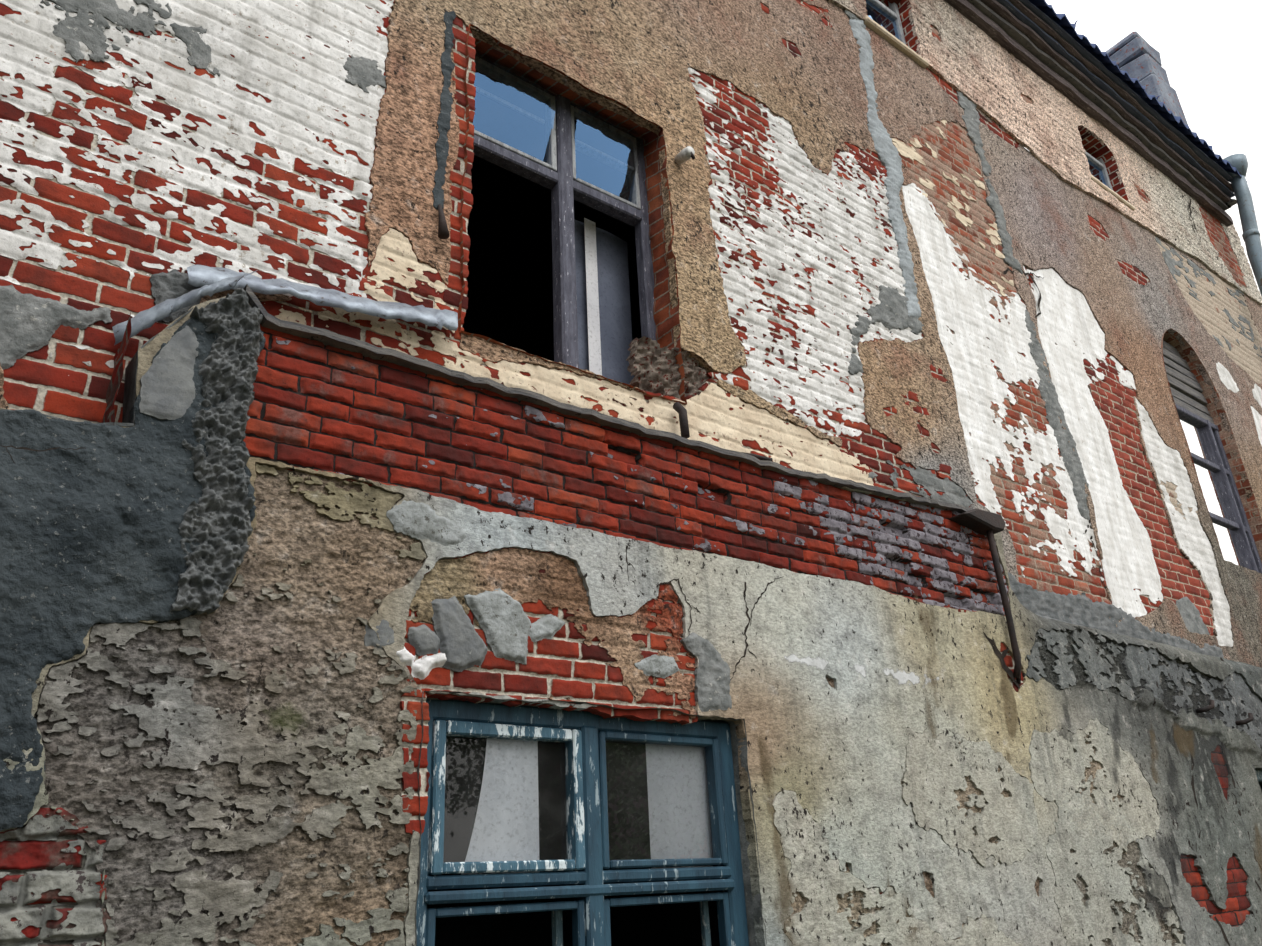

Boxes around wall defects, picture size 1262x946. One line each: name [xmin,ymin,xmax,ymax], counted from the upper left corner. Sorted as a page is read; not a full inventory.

peeling [0,0,1233,647]
spalling [1154,205,1262,385]
peeling [1251,406,1262,446]
peeling [0,324,1023,946]
crack [730,576,784,681]
peeling [901,718,1186,946]
spalling [1180,854,1250,927]
spalling [1211,745,1229,800]